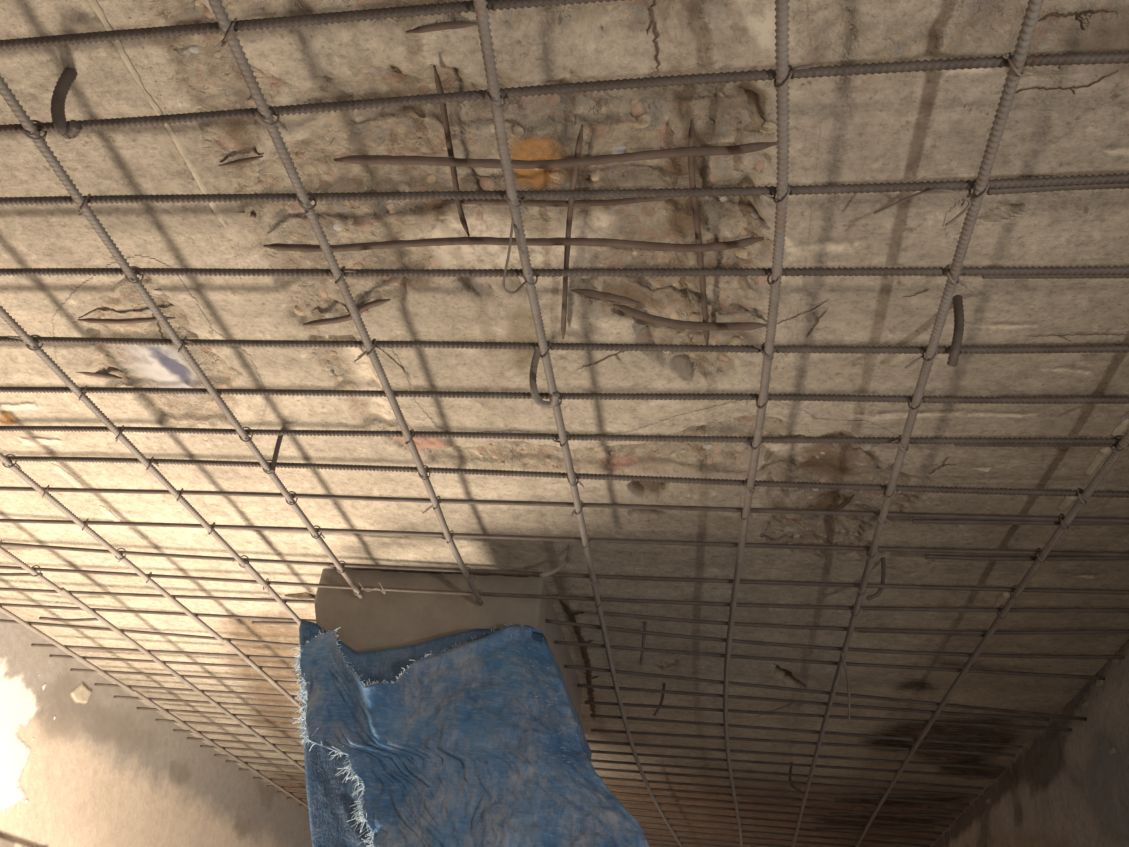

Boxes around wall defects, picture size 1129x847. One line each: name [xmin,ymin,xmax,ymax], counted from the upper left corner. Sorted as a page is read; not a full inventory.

crack [1015,70,1119,94]
crack [1037,9,1111,31]
corrosion [515,140,561,188]
spalling [51,256,269,449]
spalling [124,0,1129,572]
flaking render [0,658,46,813]
spalling [70,682,92,705]
water stain [818,639,1129,847]